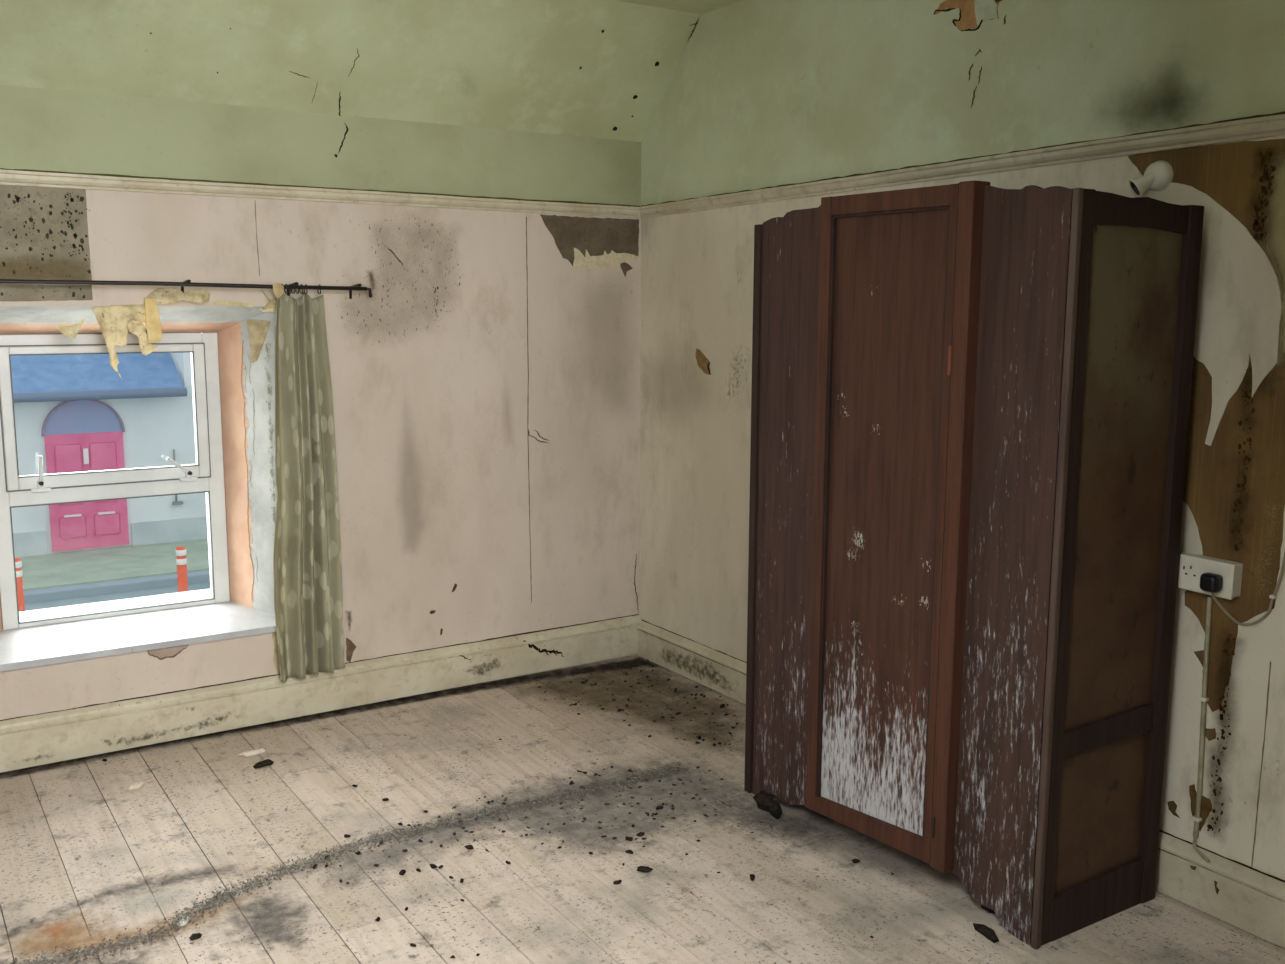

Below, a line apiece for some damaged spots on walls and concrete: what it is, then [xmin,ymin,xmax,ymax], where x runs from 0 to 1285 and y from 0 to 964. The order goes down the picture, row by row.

spalling [934,0,1002,31]
crack [289,49,360,158]
crack [968,49,982,108]
peeling [540,214,639,277]
water stain [341,215,460,343]
peeling [1128,139,1285,834]
peeling [147,644,189,660]
water stain [1205,728,1216,741]
water stain [1167,784,1212,831]